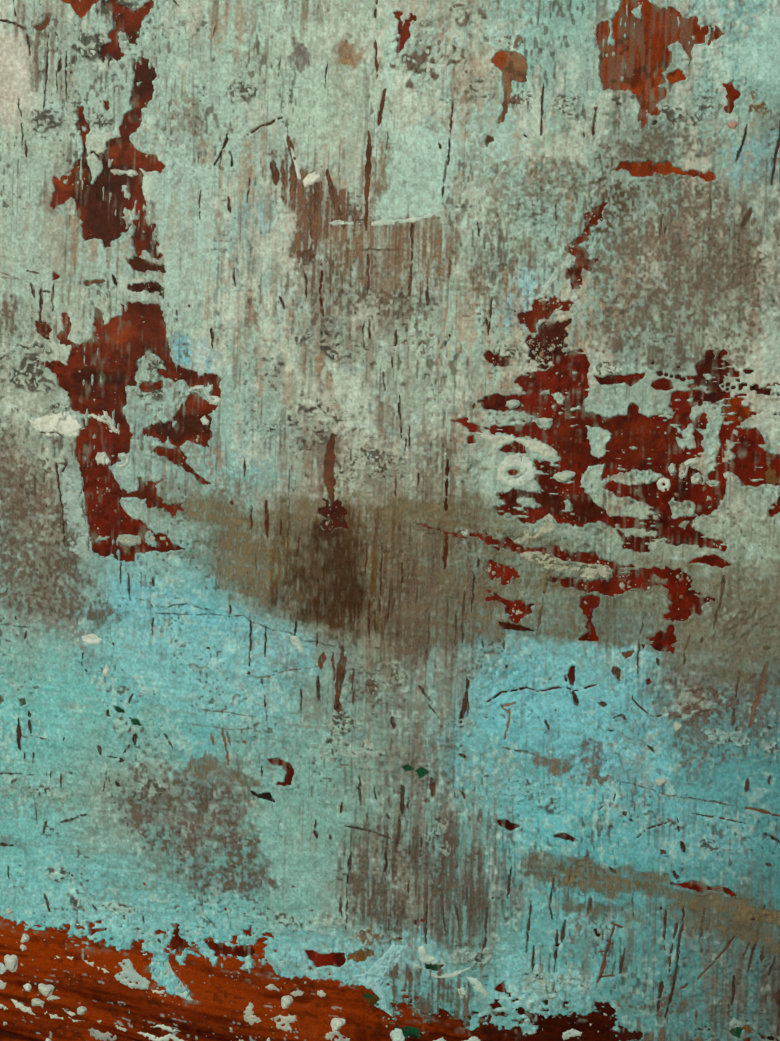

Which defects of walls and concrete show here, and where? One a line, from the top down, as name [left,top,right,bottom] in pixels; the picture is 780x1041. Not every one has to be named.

spalling [364,0,546,124]
peeling [548,0,772,132]
peeling [609,160,716,182]
peeling [0,0,356,562]
spalling [235,388,421,533]
peeling [417,202,780,659]
leakage [158,479,646,723]
leakage [671,573,778,665]
peeling [0,863,643,1041]
peeling [729,1017,779,1041]